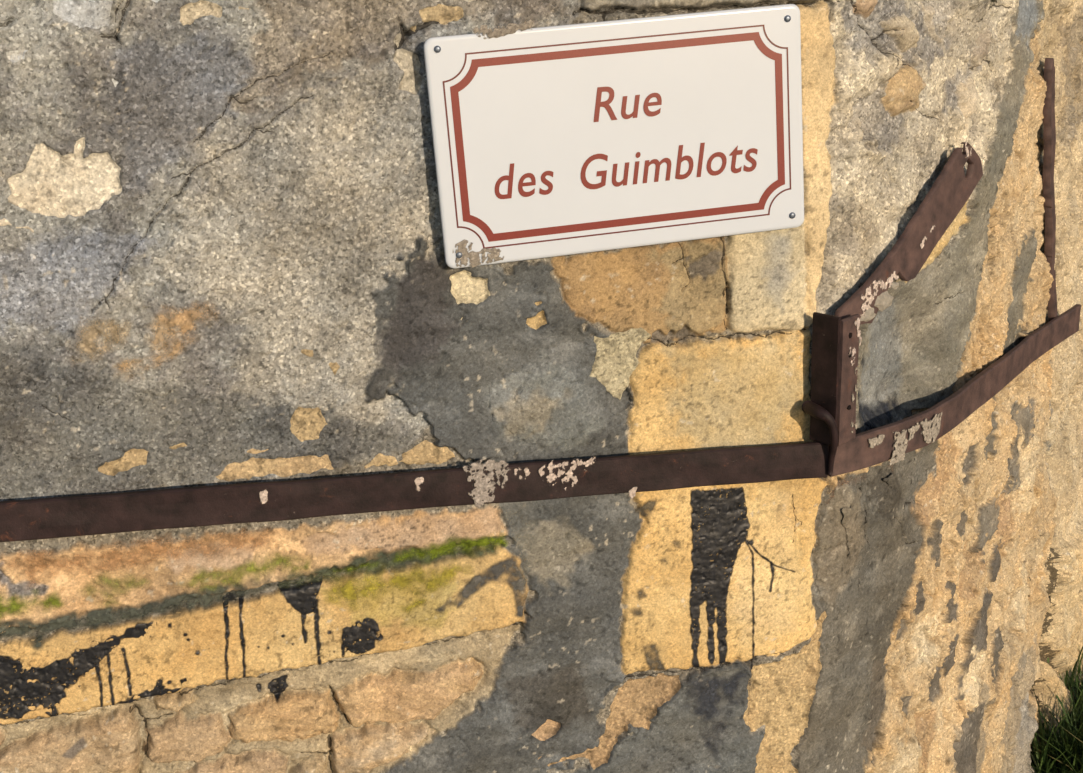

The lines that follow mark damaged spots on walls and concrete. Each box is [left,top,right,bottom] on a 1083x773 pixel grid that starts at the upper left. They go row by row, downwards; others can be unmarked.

crack [101,0,130,45]
spalling [7,137,122,218]
crack [91,54,329,314]
peeling [861,271,899,316]
spalling [590,327,651,399]
spalling [532,719,561,741]
spalling [538,673,681,770]
spalling [743,611,827,773]